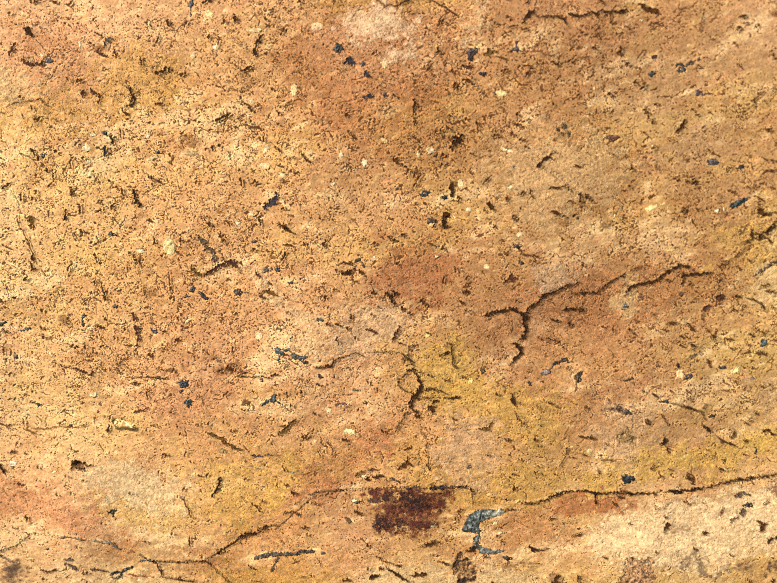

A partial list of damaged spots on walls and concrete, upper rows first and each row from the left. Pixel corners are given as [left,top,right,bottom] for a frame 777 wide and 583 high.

crack [482,211,777,368]
crack [314,343,459,432]
crack [505,459,777,513]